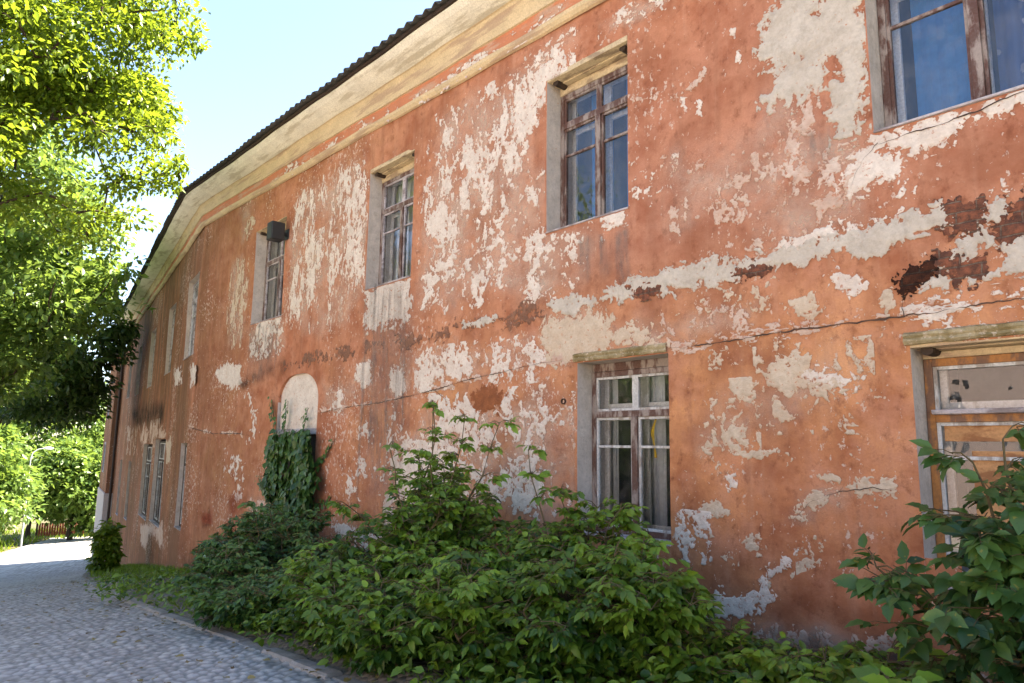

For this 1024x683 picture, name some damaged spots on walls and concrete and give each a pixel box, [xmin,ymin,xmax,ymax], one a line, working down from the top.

crack [854,91,1024,177]
peeling [215,0,1024,661]
crack [671,295,1024,355]
crack [318,351,565,427]